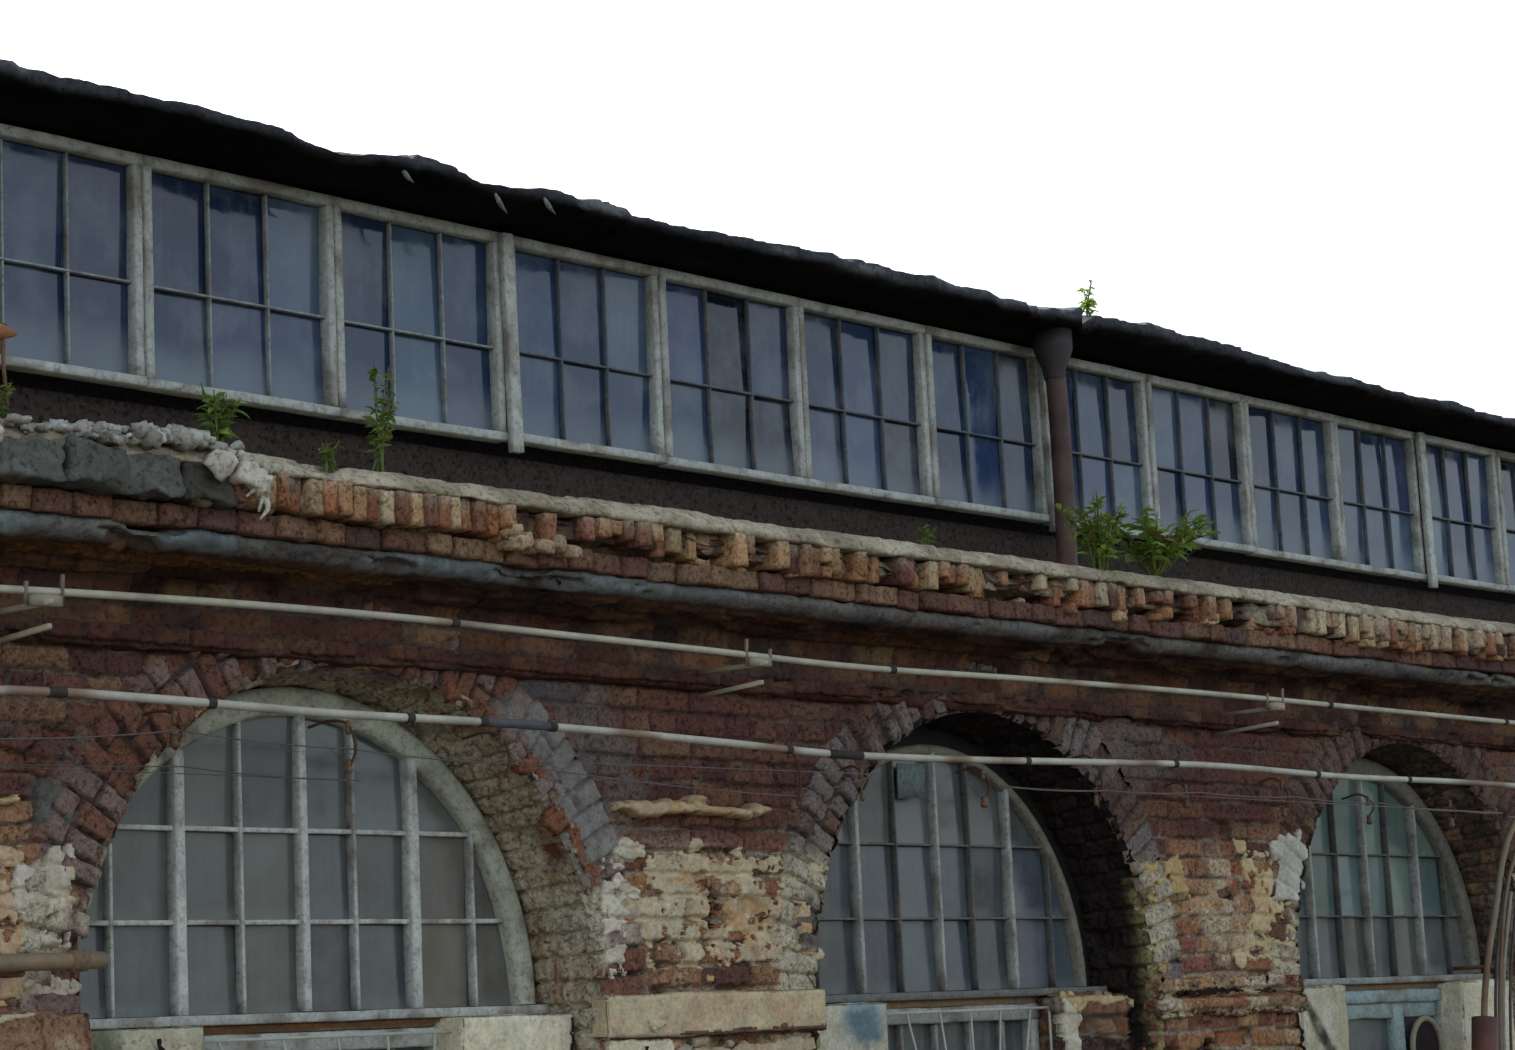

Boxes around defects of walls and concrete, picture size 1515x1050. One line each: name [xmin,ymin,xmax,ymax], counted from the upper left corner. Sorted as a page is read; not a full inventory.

flaking render [0,794,20,805]
flaking render [443,682,825,995]
flaking render [0,844,76,954]
flaking render [1141,854,1189,909]
flaking render [1216,829,1308,970]
flaking render [0,974,82,1024]
crack [157,1038,166,1050]
flaking render [1051,991,1218,1050]